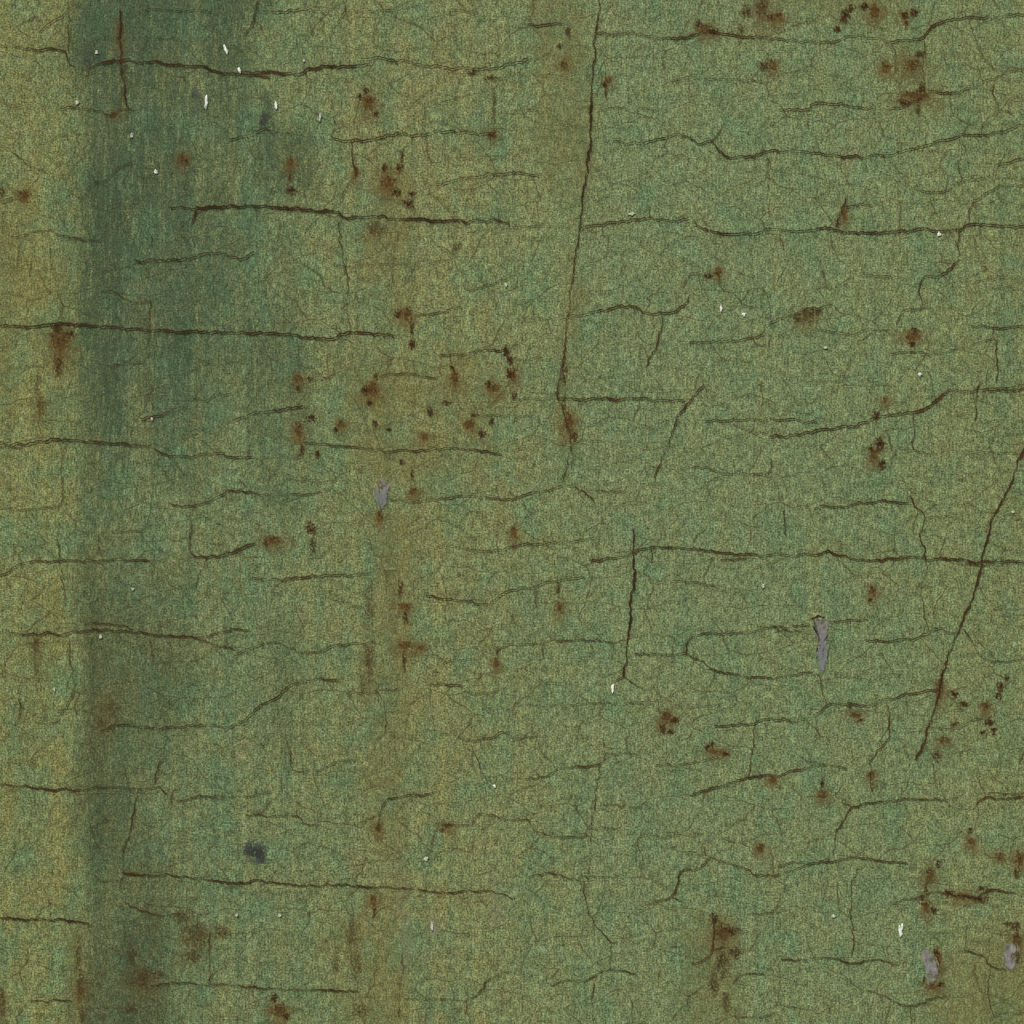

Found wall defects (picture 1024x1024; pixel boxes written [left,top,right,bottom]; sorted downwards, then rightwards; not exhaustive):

rust [833,2,879,33]
rust [880,50,929,114]
rust [379,149,415,209]
crack [0,0,1024,502]
rust [484,342,517,400]
rust [868,436,886,470]
peeling [811,613,828,671]
crack [422,433,1024,1022]
rust [979,676,1009,735]
leakage [245,844,266,863]
peeling [922,950,941,982]
peeling [1004,941,1020,970]